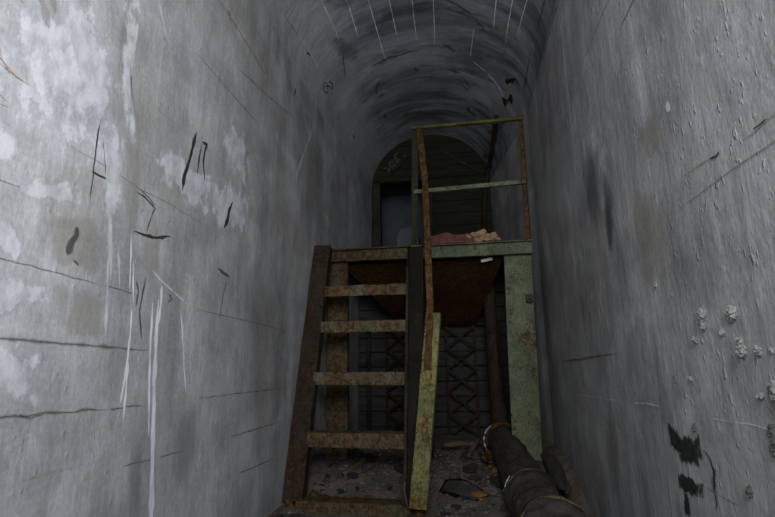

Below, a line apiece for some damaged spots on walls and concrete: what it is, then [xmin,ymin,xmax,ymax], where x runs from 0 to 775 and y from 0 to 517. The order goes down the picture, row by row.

crack [0,338,135,350]
crack [0,405,146,418]
leakage [105,212,134,419]
leakage [148,287,163,517]